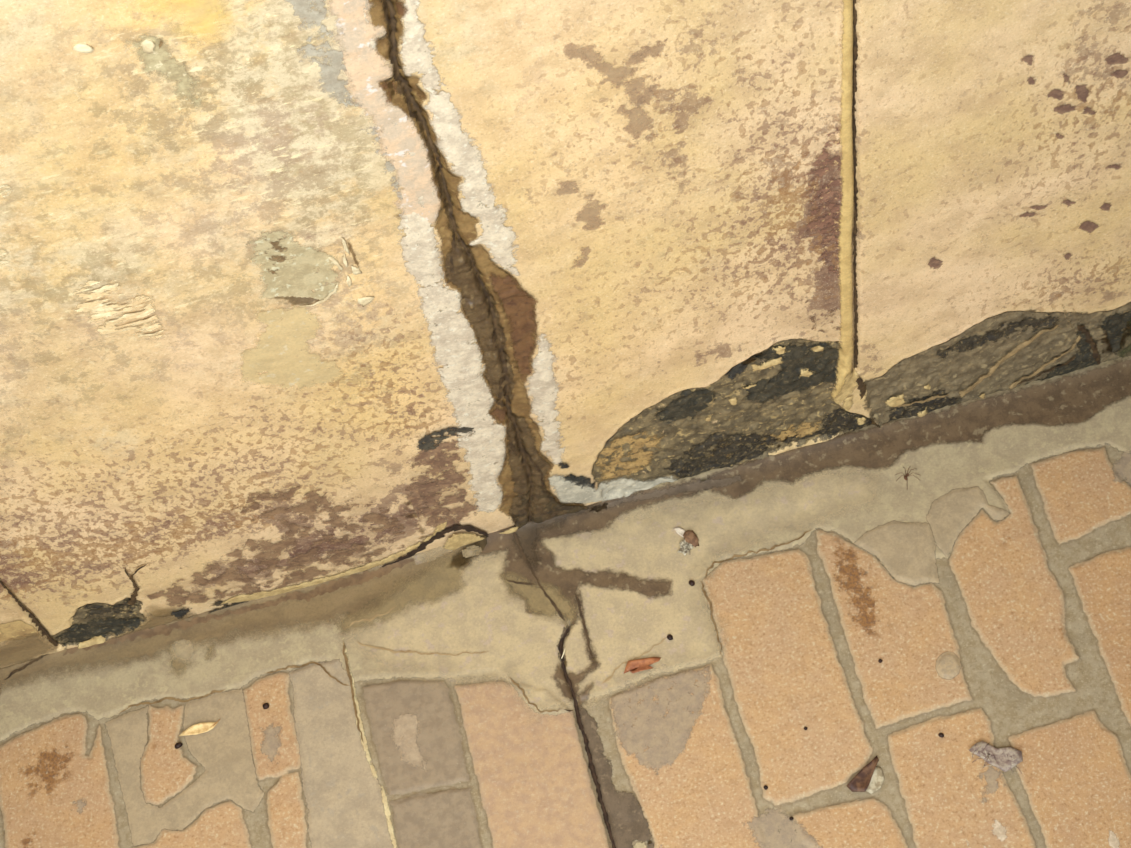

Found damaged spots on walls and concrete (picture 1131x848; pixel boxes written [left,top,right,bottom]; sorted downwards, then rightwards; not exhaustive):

crack [852,0,866,399]
crack [382,0,667,848]
damp [285,0,1131,848]
spalling [558,302,1131,489]
crack [0,581,58,646]
spalling [52,598,147,649]
damp [0,487,474,688]